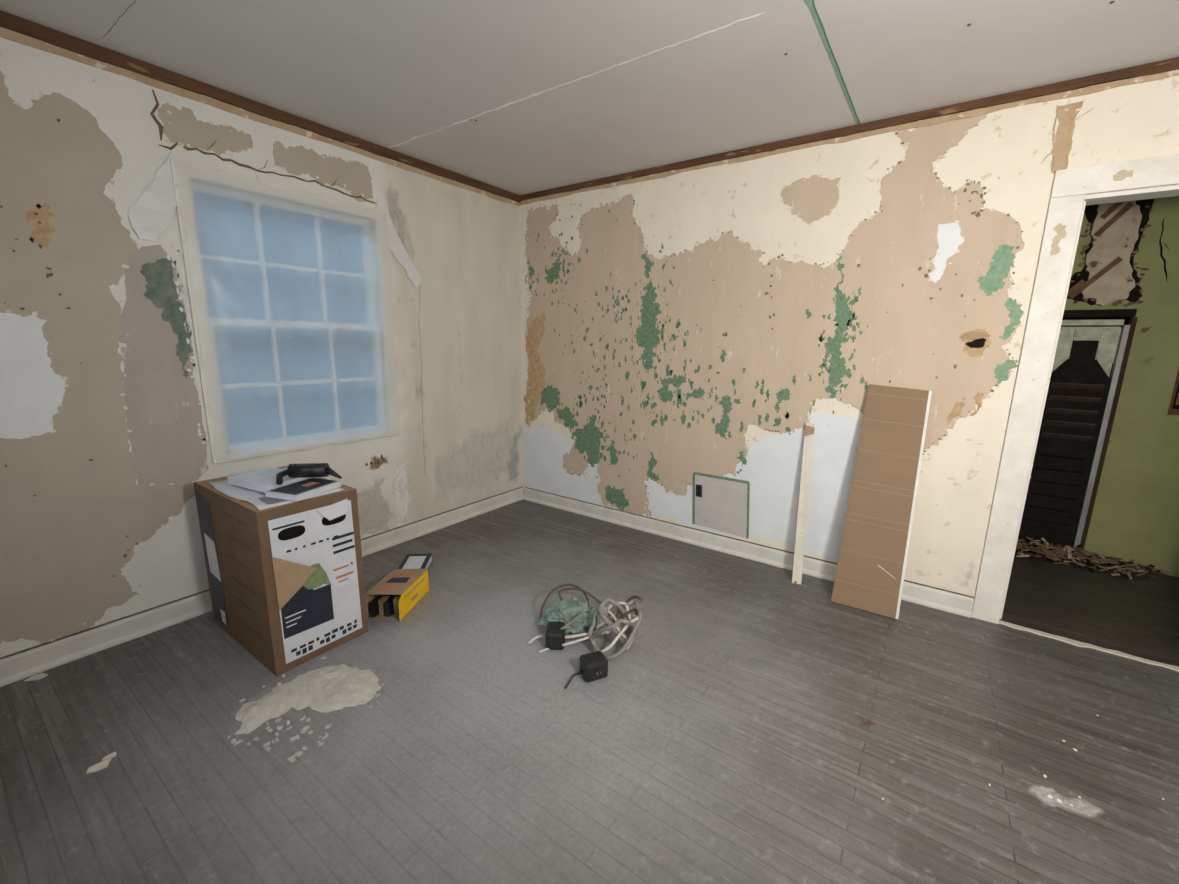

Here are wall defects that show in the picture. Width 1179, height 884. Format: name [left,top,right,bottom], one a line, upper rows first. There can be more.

peeling [158,102,253,156]
peeling [272,140,374,202]
peeling [1043,99,1086,174]
flaking render [1067,204,1098,306]
flaking render [1113,199,1155,307]
peeling [0,71,210,650]
peeling [522,114,1025,561]